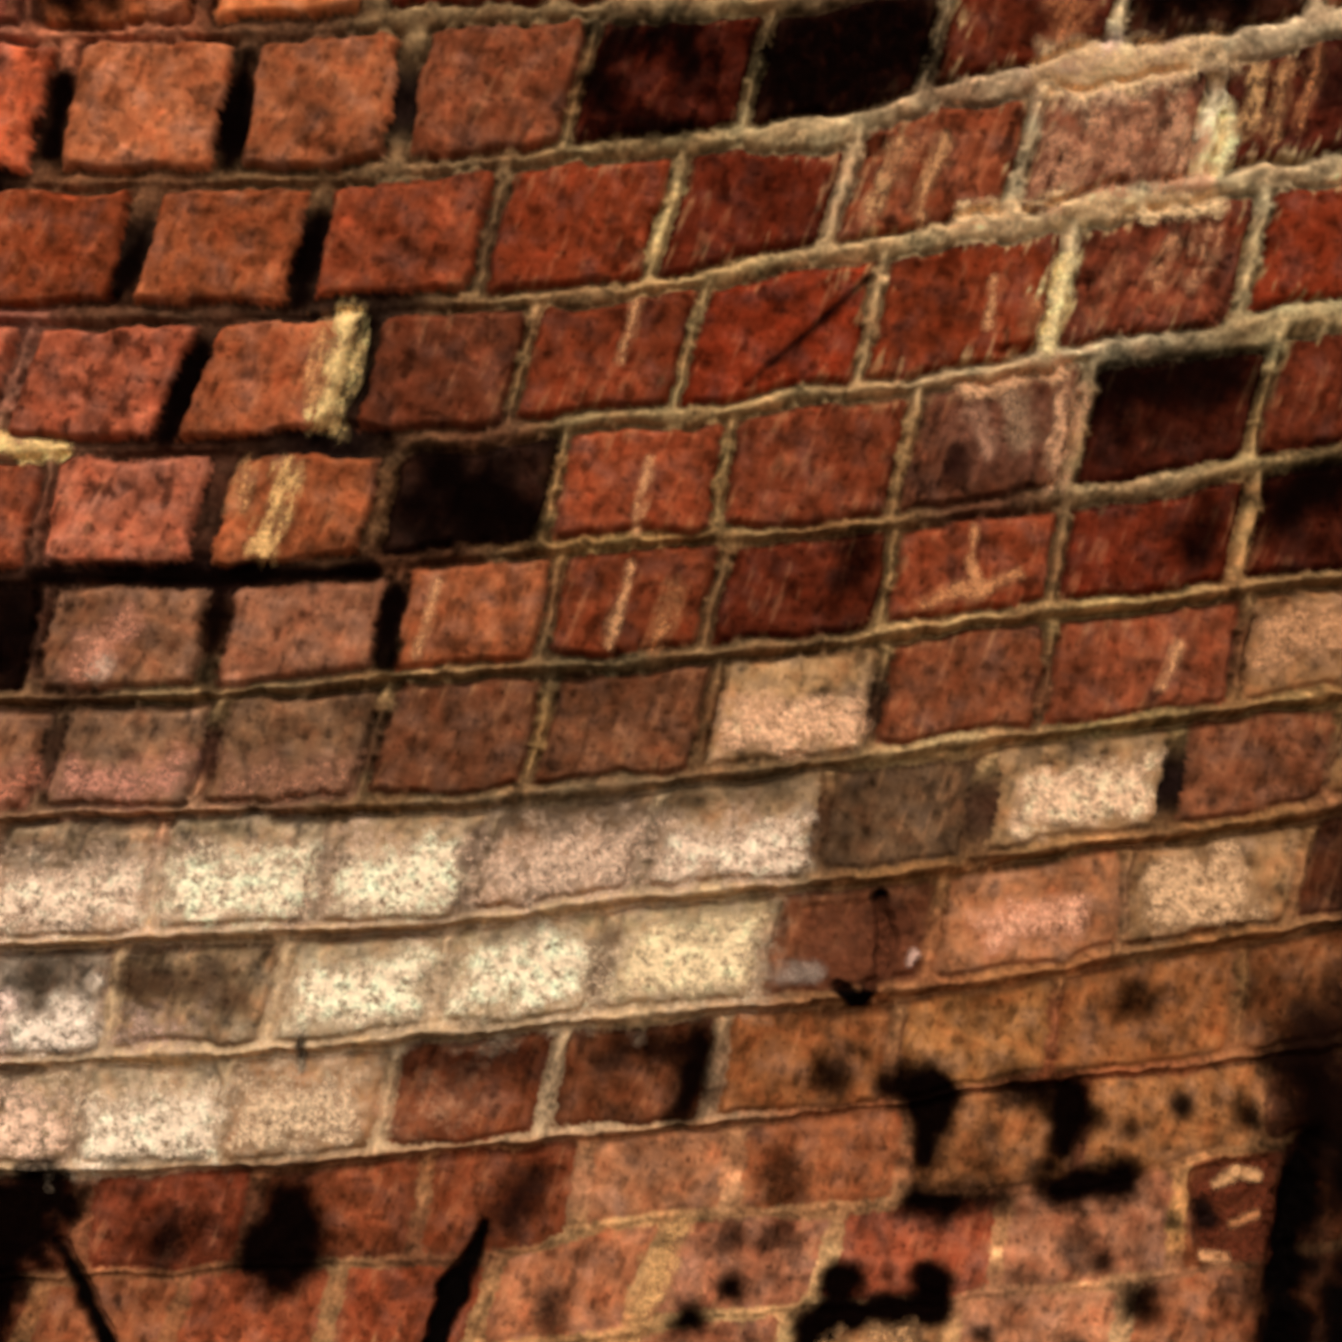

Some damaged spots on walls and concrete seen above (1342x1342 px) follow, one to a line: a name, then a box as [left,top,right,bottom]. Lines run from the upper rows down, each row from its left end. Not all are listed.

leakage [305,306,378,433]